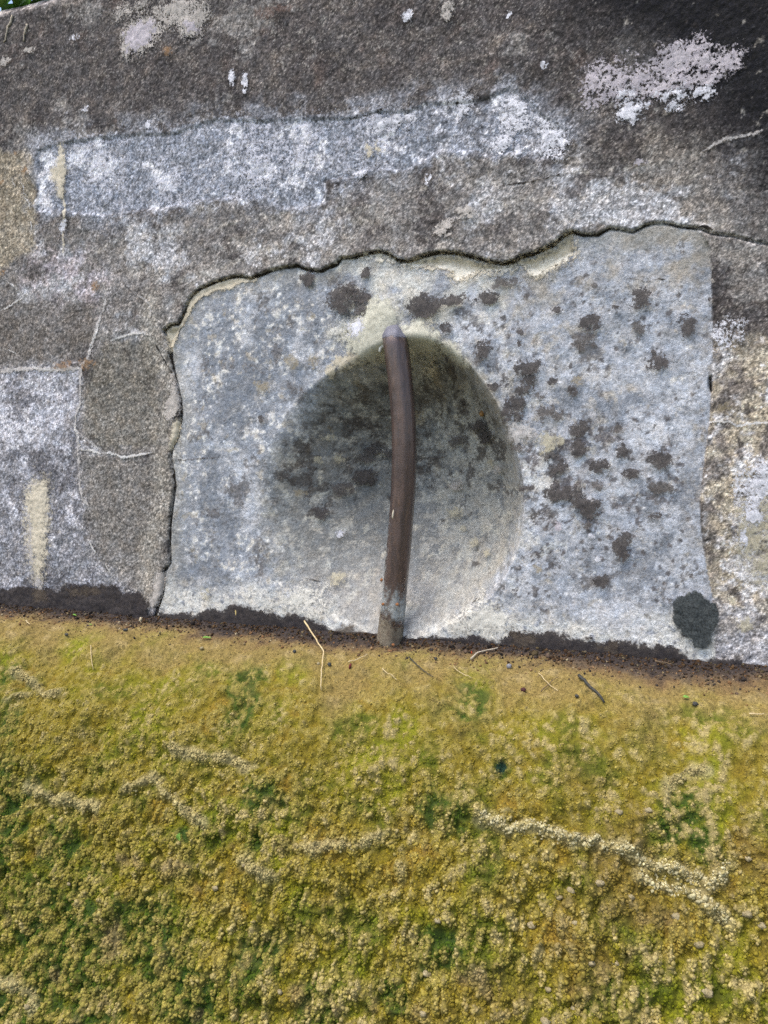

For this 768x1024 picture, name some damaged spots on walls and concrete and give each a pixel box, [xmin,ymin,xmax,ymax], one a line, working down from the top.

crack [0,203,748,616]
crack [709,419,768,427]
water stain [405,588,688,661]
water stain [707,654,743,665]